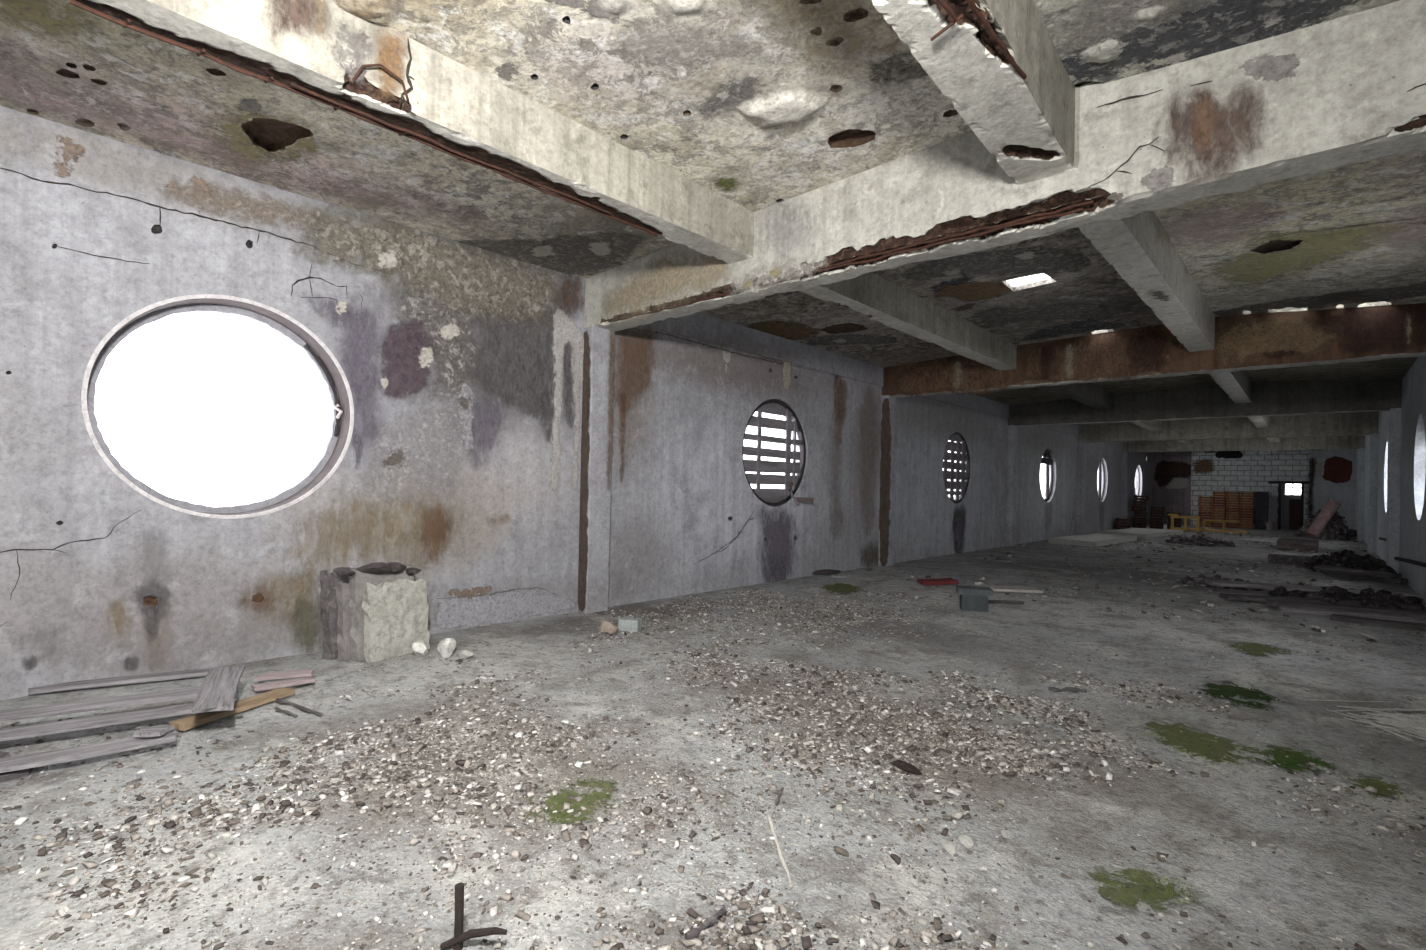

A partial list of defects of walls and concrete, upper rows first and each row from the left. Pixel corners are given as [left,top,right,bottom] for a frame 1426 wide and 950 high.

spalling [810,7,868,47]
flaking render [871,53,928,85]
spalling [927,0,1027,80]
rust [216,109,318,167]
damp [1167,90,1262,178]
crack [0,168,394,310]
flaking render [69,0,663,451]
rust [935,282,1013,301]
rust [1214,304,1426,364]
rust [578,331,591,611]
rust [879,327,1171,566]
crack [0,512,137,626]